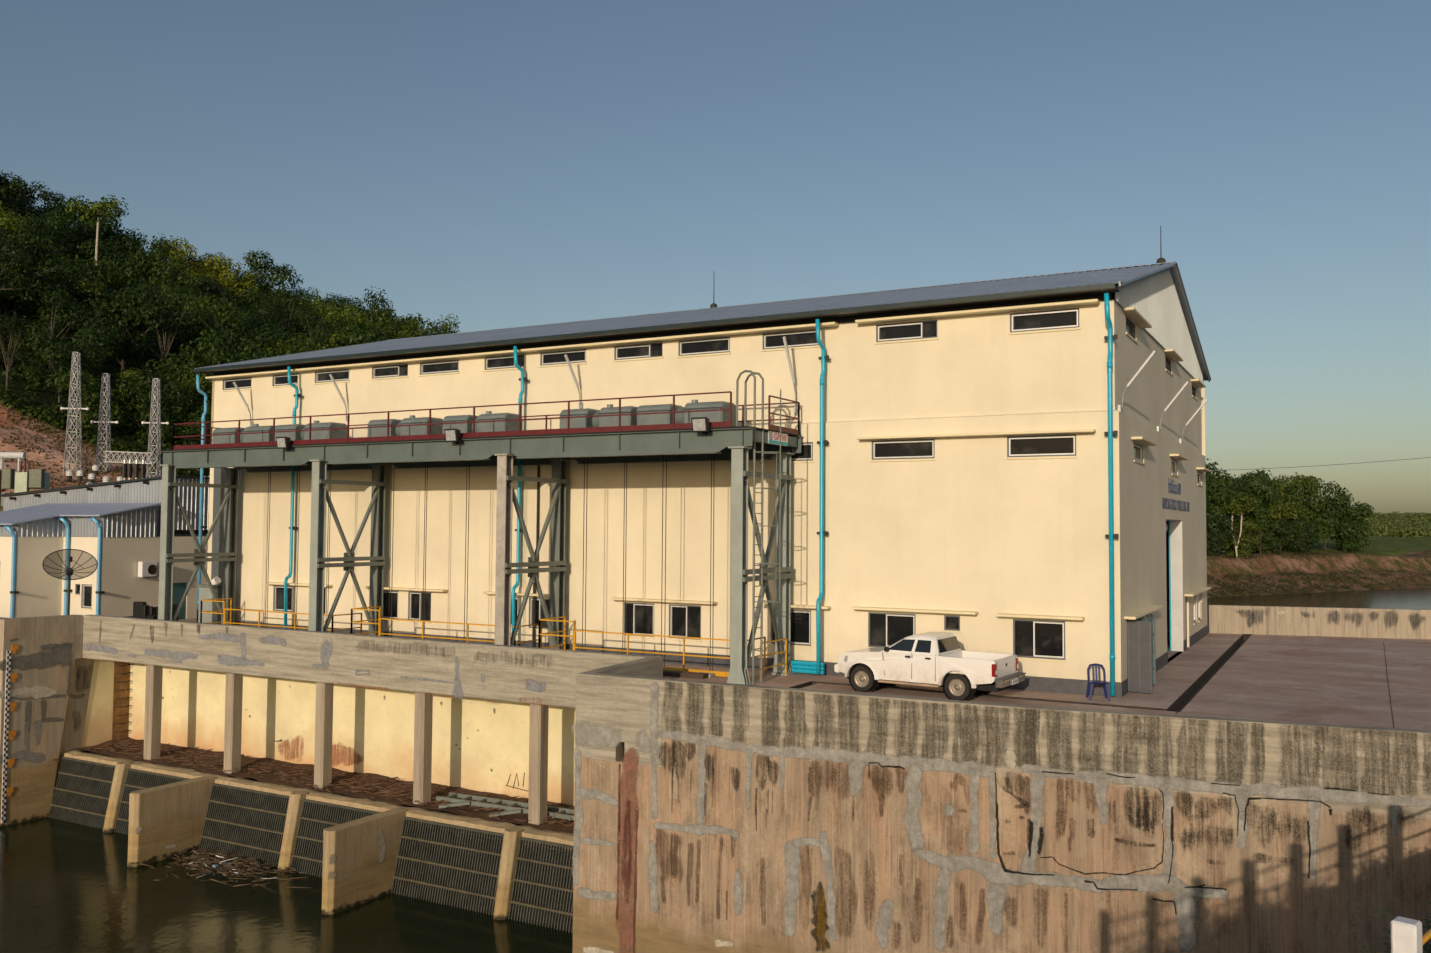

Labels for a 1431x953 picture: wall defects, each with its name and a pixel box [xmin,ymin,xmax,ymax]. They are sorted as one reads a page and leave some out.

rust [279,739,303,760]
rust [332,745,362,766]
rust [616,747,639,953]
water stain [656,830,700,906]
water stain [716,836,734,919]
water stain [801,848,875,951]
water stain [658,682,1265,852]
water stain [946,884,985,947]
crack [995,771,1227,914]
crack [1211,783,1389,878]
water stain [1281,725,1431,850]